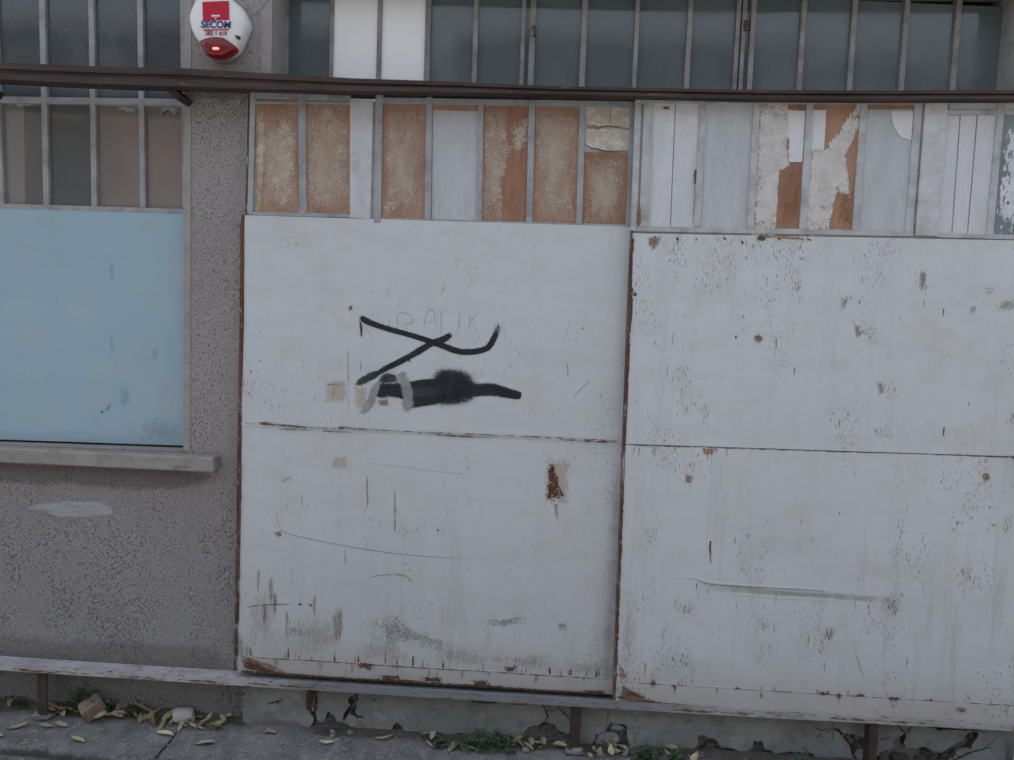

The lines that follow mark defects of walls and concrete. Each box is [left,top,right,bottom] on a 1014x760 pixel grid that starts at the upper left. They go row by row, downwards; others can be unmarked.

peeling [751,104,860,237]
peeling [997,129,1014,235]
rust [238,237,753,715]
spalling [342,693,364,720]
crack [512,704,570,723]
rust [763,688,1014,713]
crack [938,727,997,760]